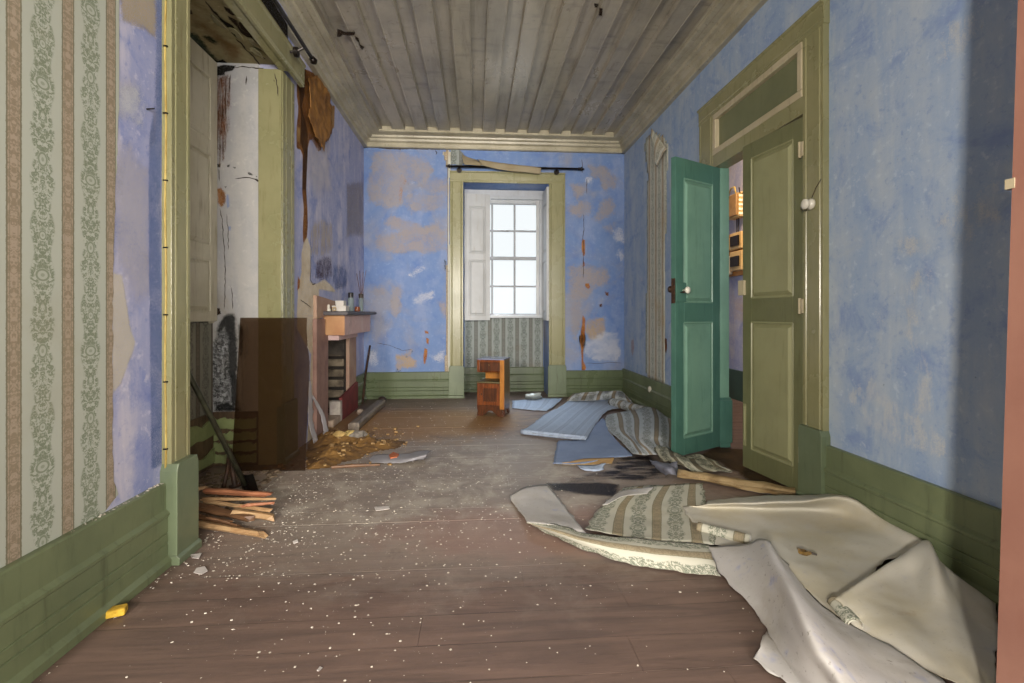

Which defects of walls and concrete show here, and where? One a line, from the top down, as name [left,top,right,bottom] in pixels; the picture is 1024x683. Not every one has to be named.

corrosion [217,75,231,167]
corrosion [217,188,226,206]
crack [220,210,233,309]
flaking render [296,70,337,441]
leakage [192,312,244,412]
peeling [567,262,634,362]